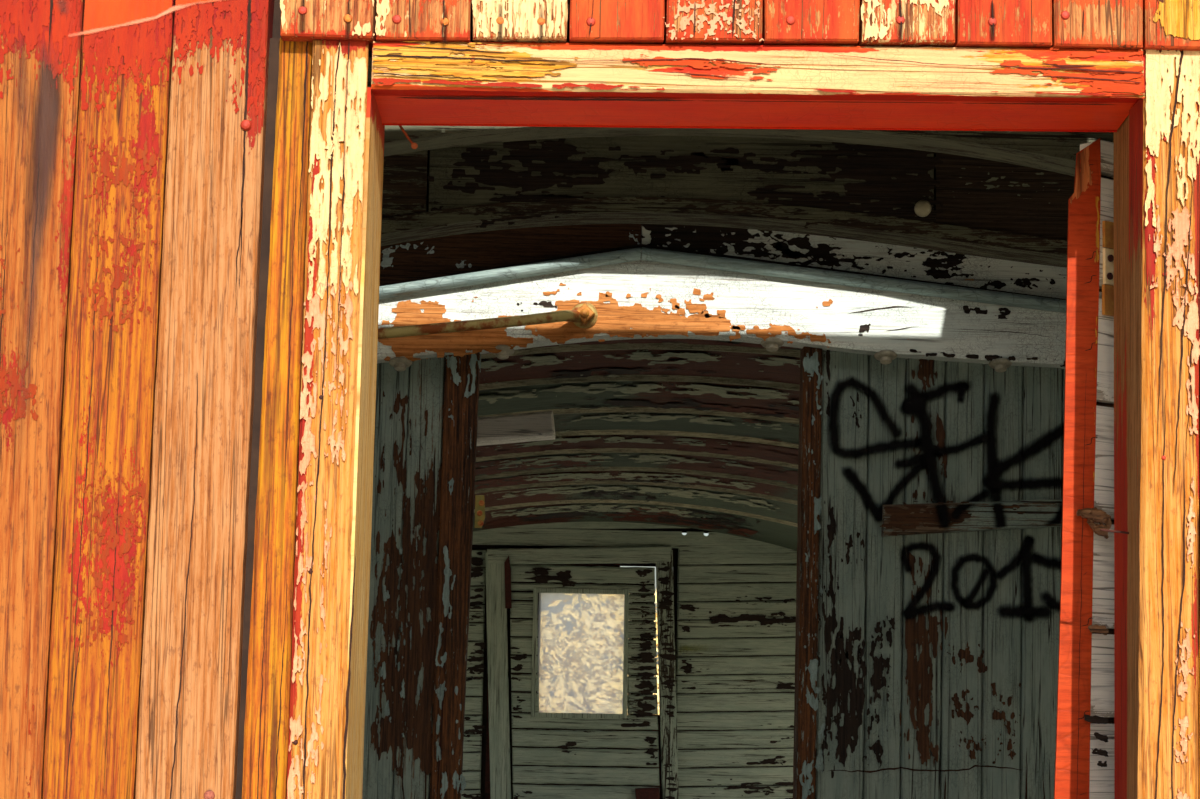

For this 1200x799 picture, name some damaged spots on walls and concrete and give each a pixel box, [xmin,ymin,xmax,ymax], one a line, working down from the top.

peeling [0,0,286,118]
peeling [861,0,893,40]
peeling [905,0,949,16]
peeling [73,127,164,344]
peeling [421,138,1065,289]
peeling [981,0,1200,435]
peeling [292,0,665,685]
peeling [963,305,1011,319]
peeling [909,349,1065,392]
peeling [370,283,862,799]
peeling [697,490,1021,799]
peeling [287,674,329,799]